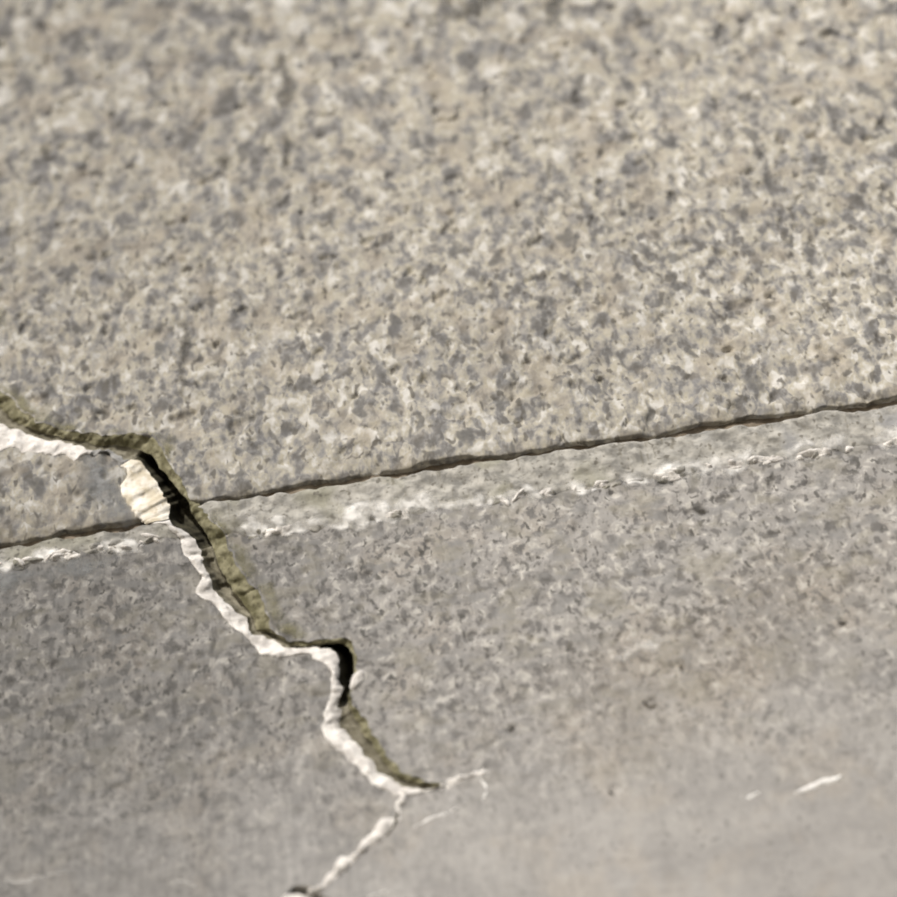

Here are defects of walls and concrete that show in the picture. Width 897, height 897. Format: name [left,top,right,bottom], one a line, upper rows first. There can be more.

crack [0,392,489,897]